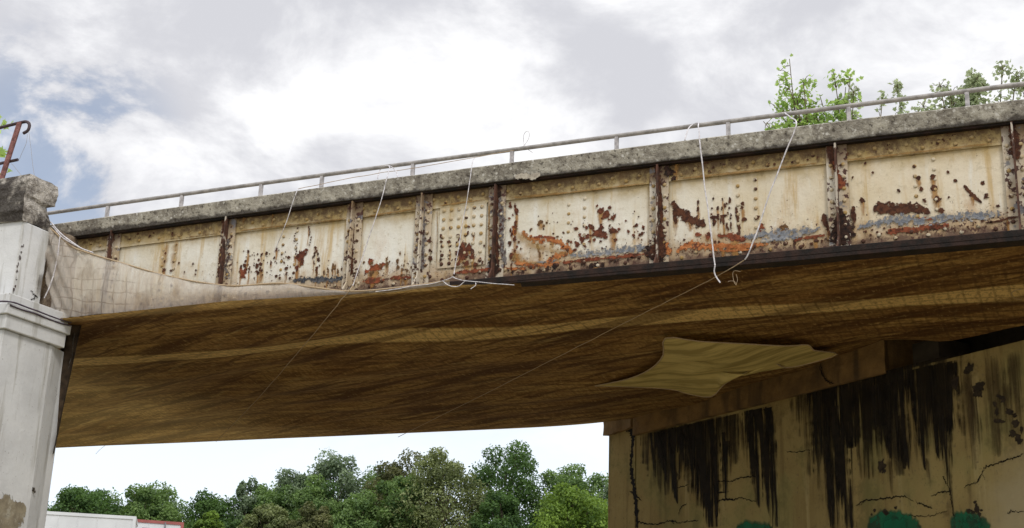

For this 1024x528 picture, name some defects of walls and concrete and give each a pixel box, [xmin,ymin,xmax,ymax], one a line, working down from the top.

rust [294,248,308,284]
rust [345,230,411,287]
rust [368,146,856,275]
rust [873,174,949,235]
crack [626,428,698,528]
leakage [640,407,778,528]
leakage [791,352,1021,528]
crack [856,453,1022,517]